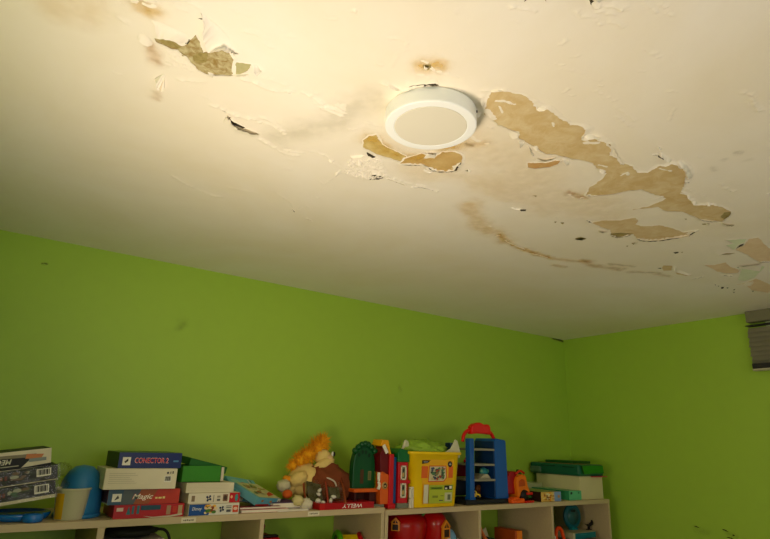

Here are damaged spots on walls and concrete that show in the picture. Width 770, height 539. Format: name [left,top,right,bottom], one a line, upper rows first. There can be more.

peeling [137,12,262,93]
peeling [377,58,462,93]
peeling [206,102,471,187]
peeling [469,85,734,247]
peeling [703,237,770,293]